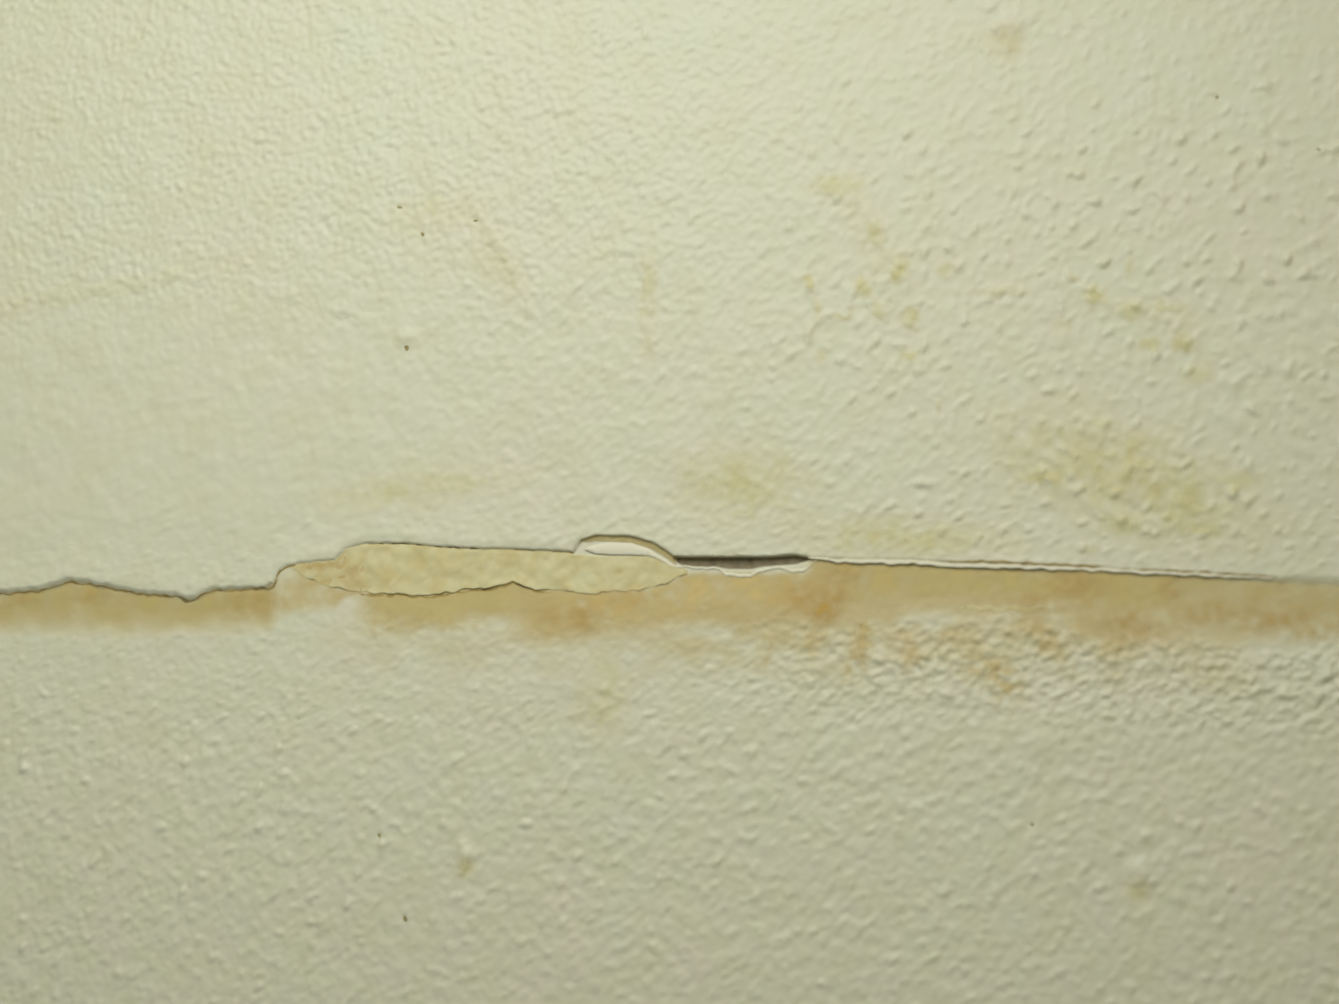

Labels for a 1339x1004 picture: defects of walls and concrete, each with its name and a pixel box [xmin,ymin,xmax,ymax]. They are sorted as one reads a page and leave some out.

crack [0,563,300,603]
crack [358,582,551,598]
crack [380,535,811,569]
water stain [523,574,832,637]
spalling [288,542,1339,627]
crack [945,560,1272,578]